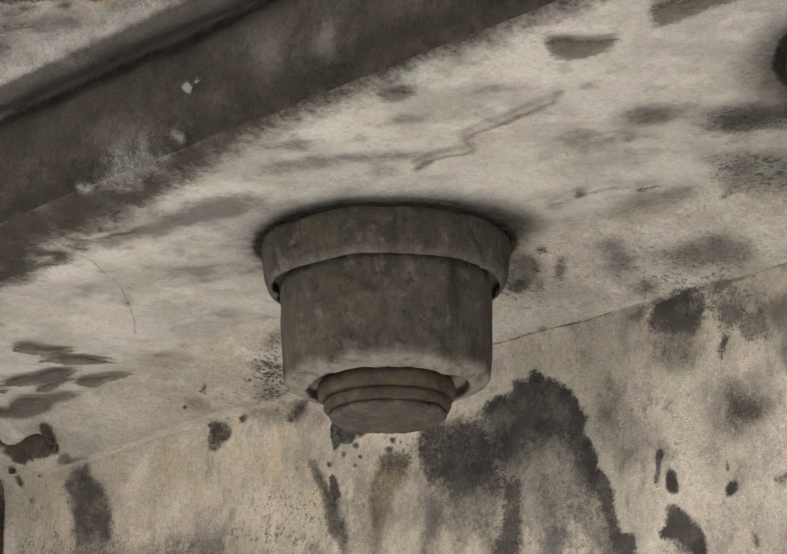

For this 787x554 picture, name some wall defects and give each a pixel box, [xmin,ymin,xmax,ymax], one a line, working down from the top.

crack [414,91,562,172]
leakage [631,281,706,362]
leakage [712,279,767,358]
leakage [65,465,216,554]
leakage [308,460,347,551]
leakage [368,369,637,554]
leakage [654,449,678,493]
leakage [659,504,706,554]